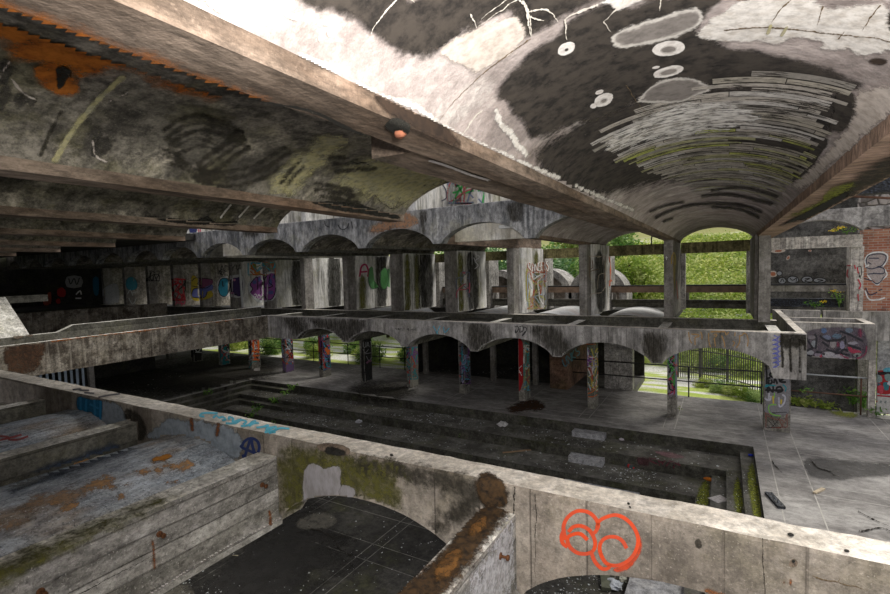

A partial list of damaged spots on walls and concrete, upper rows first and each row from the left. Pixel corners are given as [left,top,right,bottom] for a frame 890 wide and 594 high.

rust [0,1,224,98]
crack [724,0,890,42]
rust [0,474,132,531]
rust [134,453,195,483]
peeling [303,443,355,503]
damp [349,455,485,533]
damp [151,502,361,594]